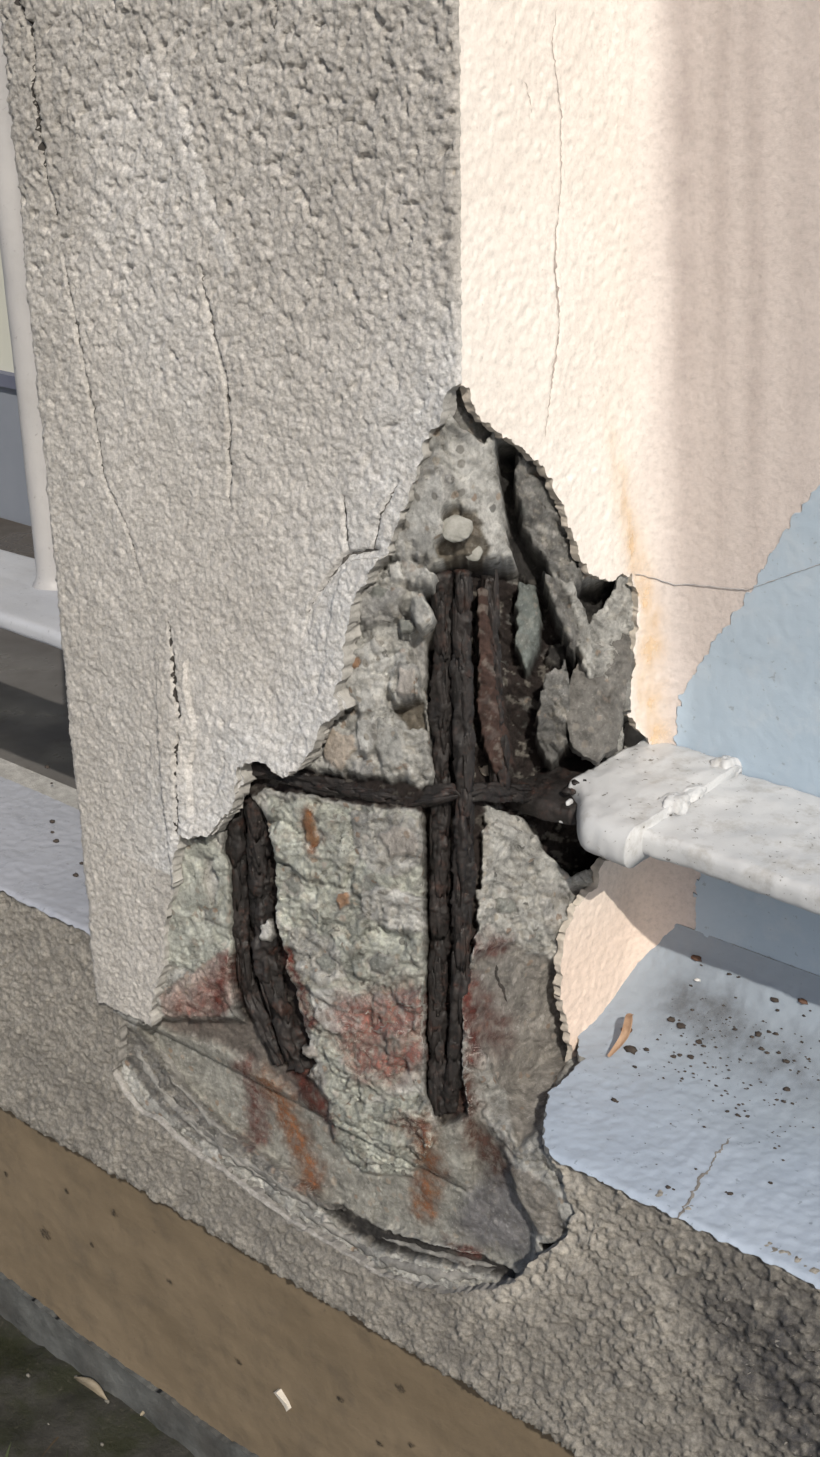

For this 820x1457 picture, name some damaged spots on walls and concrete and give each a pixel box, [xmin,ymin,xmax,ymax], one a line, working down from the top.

crack [14,0,58,216]
crack [202,267,233,507]
crack [309,486,397,612]
crack [168,622,181,834]
spalling [113,387,636,1289]
rust [562,779,587,795]
rust [236,1058,333,1191]
rust [337,996,429,1080]
rust [459,973,506,1174]